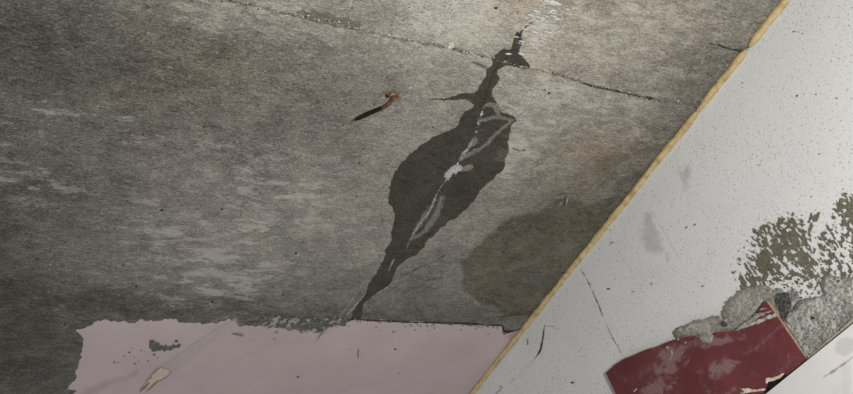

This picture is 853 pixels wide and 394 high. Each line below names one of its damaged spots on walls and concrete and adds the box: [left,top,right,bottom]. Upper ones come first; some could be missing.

damp [351,22,532,321]
damp [463,193,627,318]
peeling [731,189,853,299]
spalling [606,301,808,394]